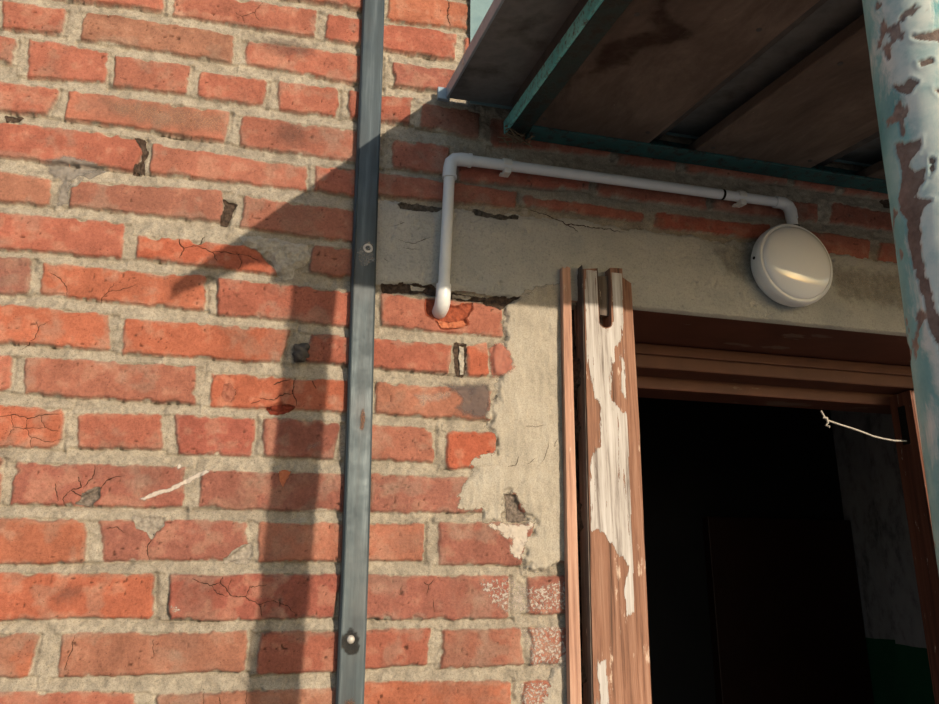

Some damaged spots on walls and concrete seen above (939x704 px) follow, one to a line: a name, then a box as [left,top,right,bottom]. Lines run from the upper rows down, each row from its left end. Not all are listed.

peeling [915,30,939,41]
peeling [895,79,918,94]
crack [527,208,620,232]
peeling [879,114,939,343]
crack [179,237,257,269]
crack [0,414,62,448]
peeling [381,282,564,573]
crack [55,469,121,502]
crack [192,577,295,616]